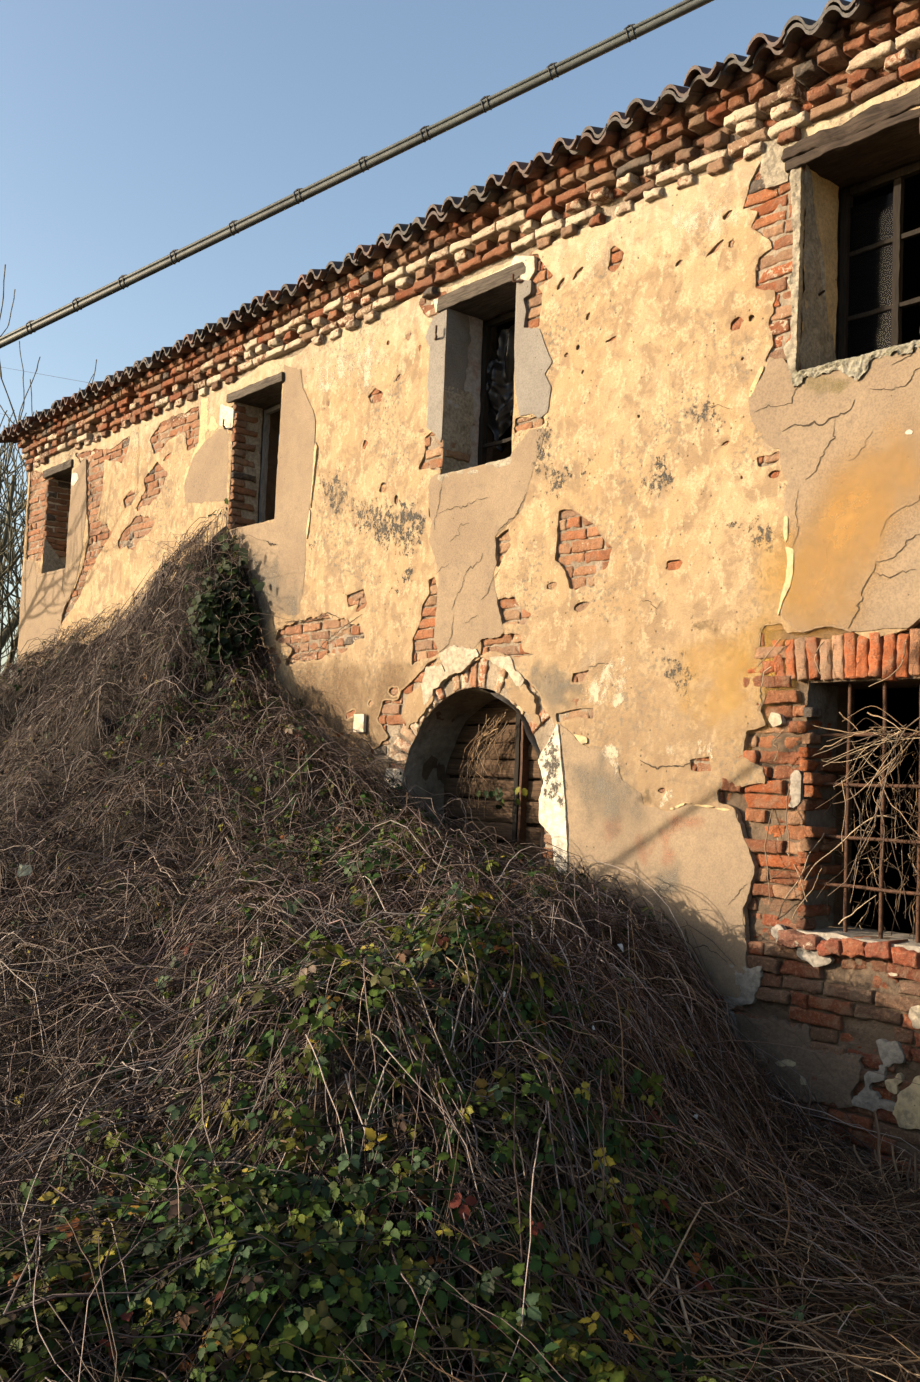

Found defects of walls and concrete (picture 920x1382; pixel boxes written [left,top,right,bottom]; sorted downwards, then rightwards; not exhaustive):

flaking render [725,167,806,397]
flaking render [27,472,55,562]
flaking render [64,398,236,619]
leakage [320,468,426,593]
flaking render [547,510,612,612]
flaking render [666,560,683,570]
crack [706,347,919,547]
crack [848,496,920,628]
flaking render [264,590,367,680]
flaking render [346,578,594,771]
flaking render [670,516,920,1212]